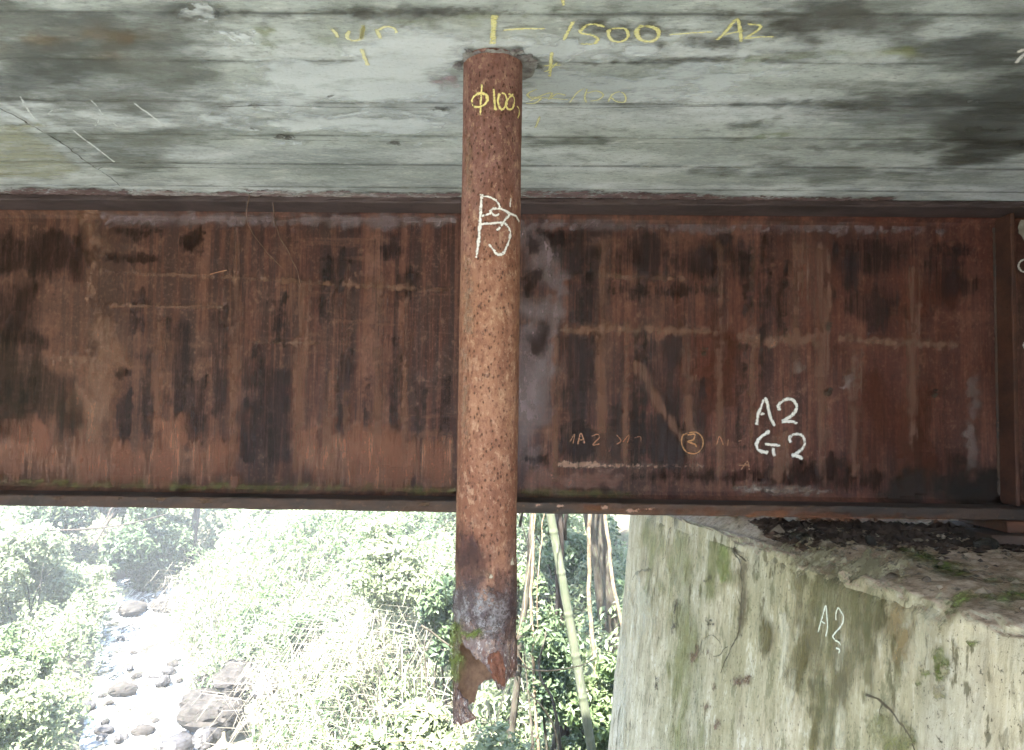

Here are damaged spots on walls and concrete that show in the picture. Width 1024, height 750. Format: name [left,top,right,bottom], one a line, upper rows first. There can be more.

leakage [0,4,220,112]
leakage [62,104,230,172]
leakage [250,8,486,134]
leakage [512,20,746,102]
leakage [764,1,874,44]
leakage [832,15,1024,165]
corrosion [0,223,455,493]
corrosion [525,229,883,495]
corrosion [454,535,483,585]
peeling [454,689,476,726]
corrosion [487,650,505,687]
leakage [759,562,941,750]